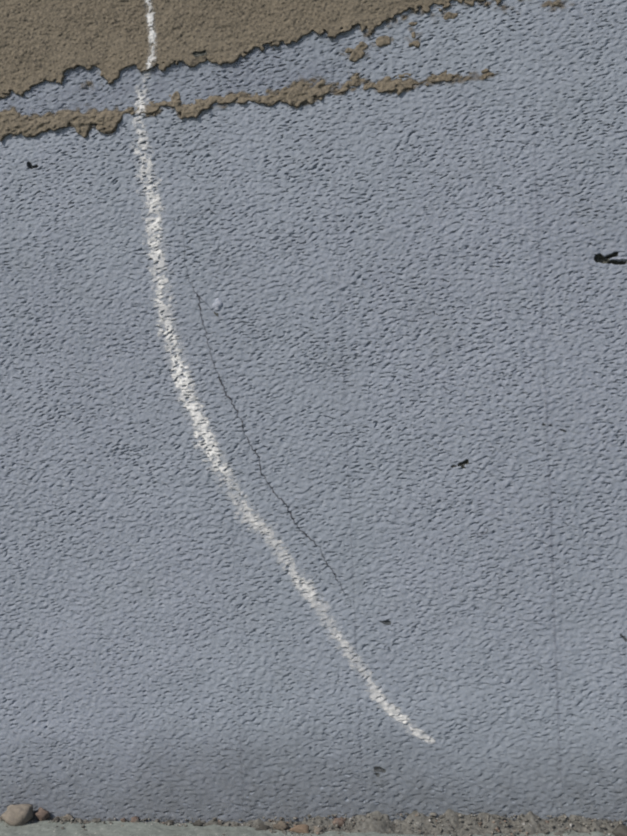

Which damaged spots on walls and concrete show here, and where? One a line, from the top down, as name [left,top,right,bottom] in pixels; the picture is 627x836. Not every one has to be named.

flaking render [0,0,507,98]
flaking render [542,0,563,10]
flaking render [0,68,495,141]
crack [214,365,339,582]